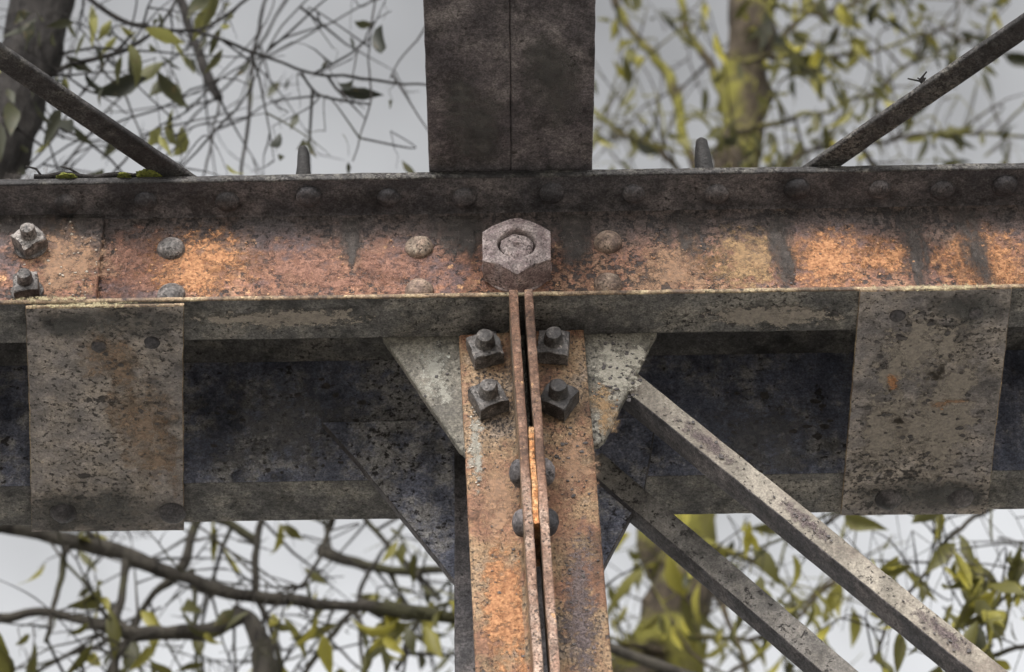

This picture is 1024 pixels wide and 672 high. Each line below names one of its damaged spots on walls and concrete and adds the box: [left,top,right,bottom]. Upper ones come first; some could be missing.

rust [24,221,446,299]
rust [629,224,774,290]
rust [786,228,1024,287]
rust [553,427,598,501]
rust [476,445,528,672]
rust [557,510,602,672]